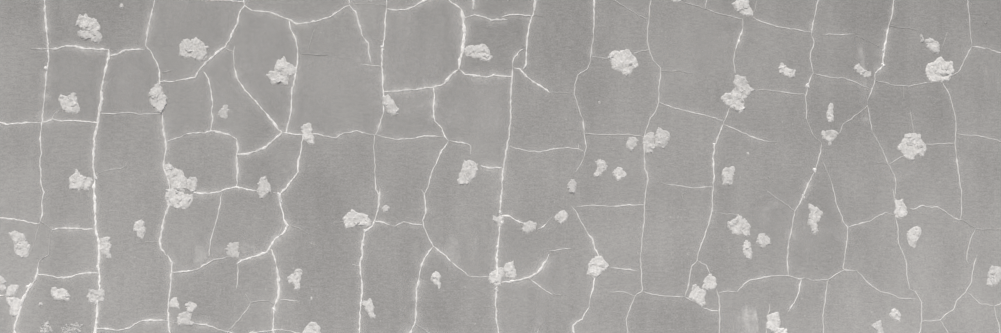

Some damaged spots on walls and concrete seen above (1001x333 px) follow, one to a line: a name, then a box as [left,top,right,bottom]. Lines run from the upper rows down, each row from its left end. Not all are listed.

spalling [76,14,102,44]
spalling [179,37,209,61]
spalling [266,56,298,85]
spalling [464,44,493,62]
spalling [608,49,638,77]
spalling [920,34,955,83]
spalling [721,75,754,114]
spalling [897,133,927,160]
crack [0,0,770,333]
crack [687,0,1001,333]
spalling [164,162,198,210]
spalling [343,209,371,229]